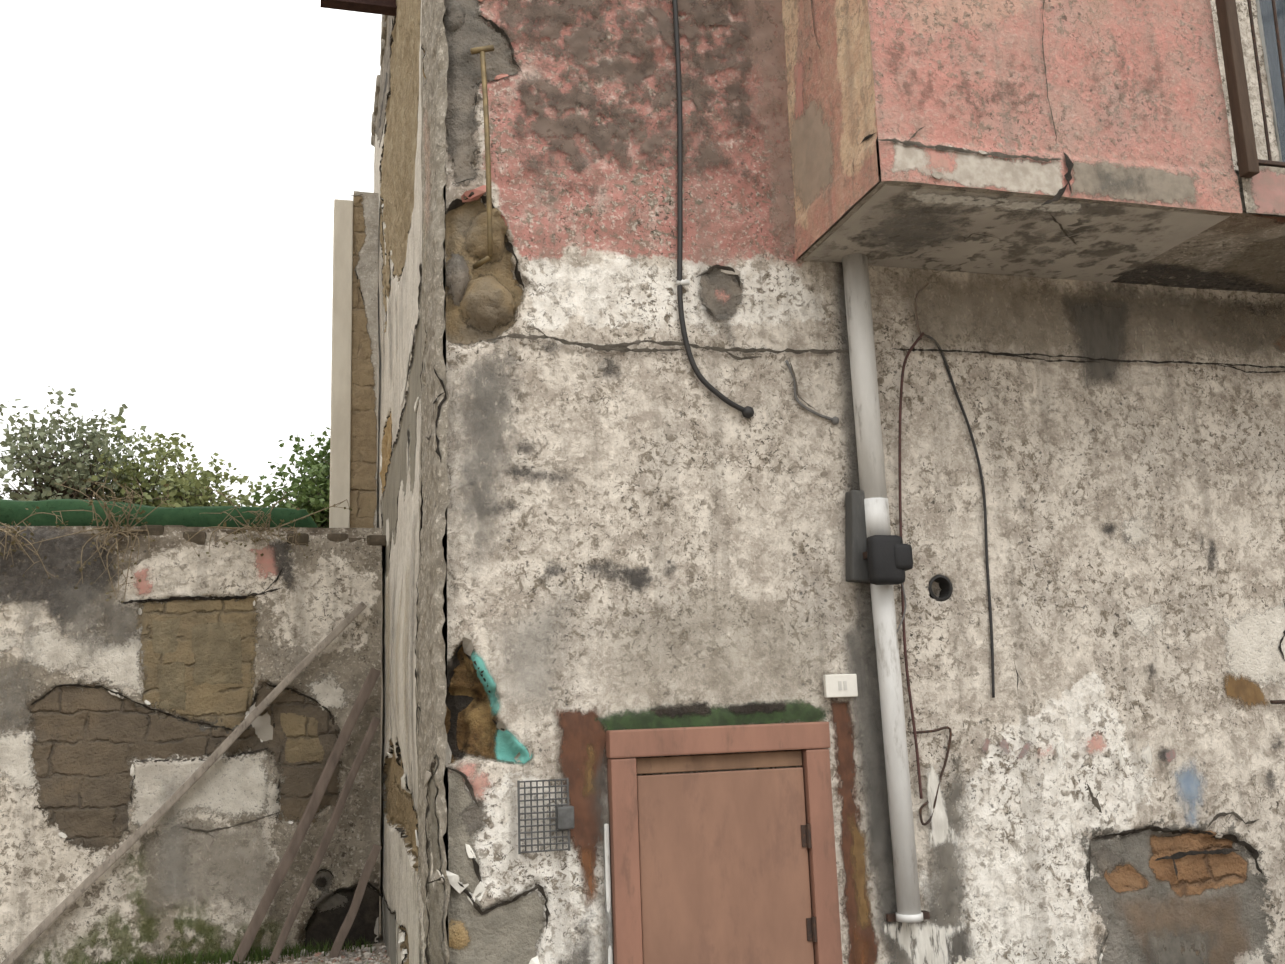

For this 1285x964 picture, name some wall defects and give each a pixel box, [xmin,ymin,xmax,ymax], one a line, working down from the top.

mould [497,0,773,197]
flaking render [347,0,426,576]
crack [482,326,849,410]
damp [837,187,1285,491]
crack [892,348,1285,373]
flaking render [0,568,347,857]
flaking render [302,633,550,964]
corrosion [556,708,607,904]
corrosion [830,701,878,964]
damp [849,583,975,964]
flaking render [1077,815,1282,964]
crack [1277,603,1285,661]